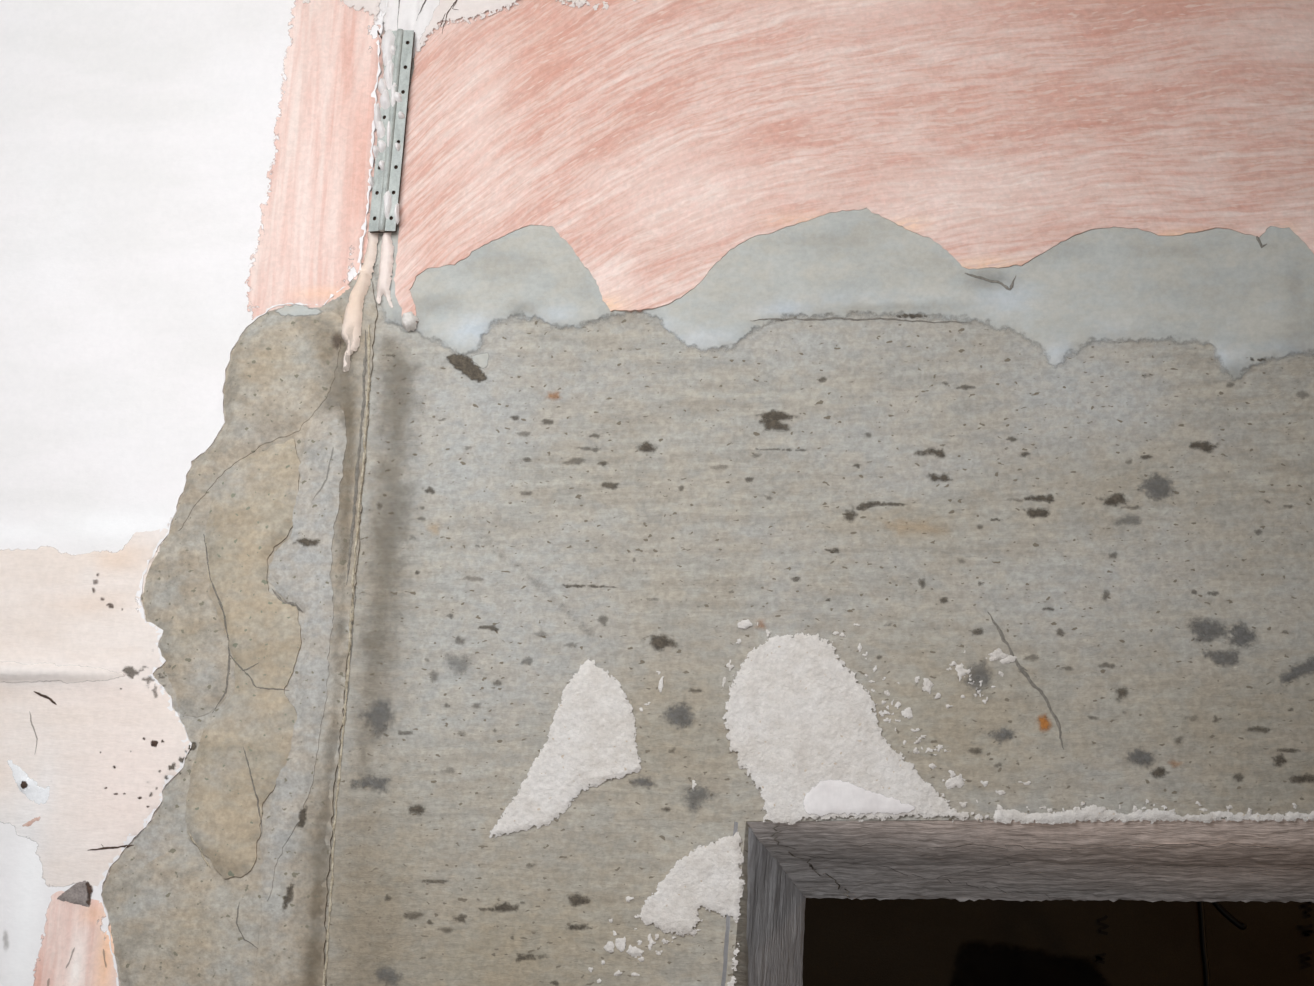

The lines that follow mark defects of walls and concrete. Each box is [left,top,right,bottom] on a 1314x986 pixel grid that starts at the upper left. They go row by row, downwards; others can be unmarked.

spalling [447,353,489,382]
spalling [759,410,793,431]
spalling [845,501,904,520]
spalling [1024,495,1054,517]
flaking render [33,230,419,986]
spalling [651,636,674,650]
crack [988,612,1064,749]
water stain [365,702,391,733]
water stain [665,704,691,726]
flaking render [833,623,1017,809]
water stain [352,777,389,790]
peeling [588,919,701,983]